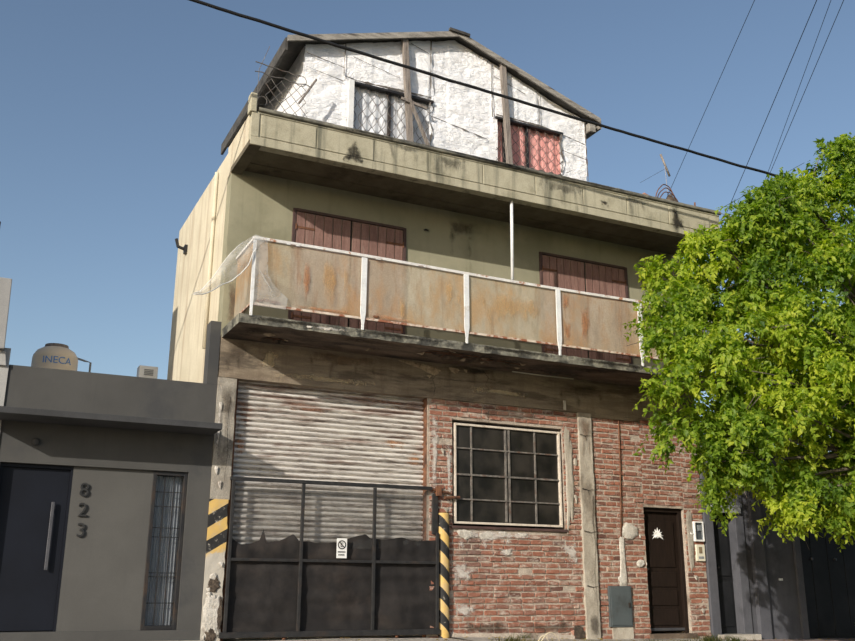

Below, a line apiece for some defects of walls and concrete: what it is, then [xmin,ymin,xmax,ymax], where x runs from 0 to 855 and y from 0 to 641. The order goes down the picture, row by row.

mould [343,145,361,162]
peeling [201,561,223,641]